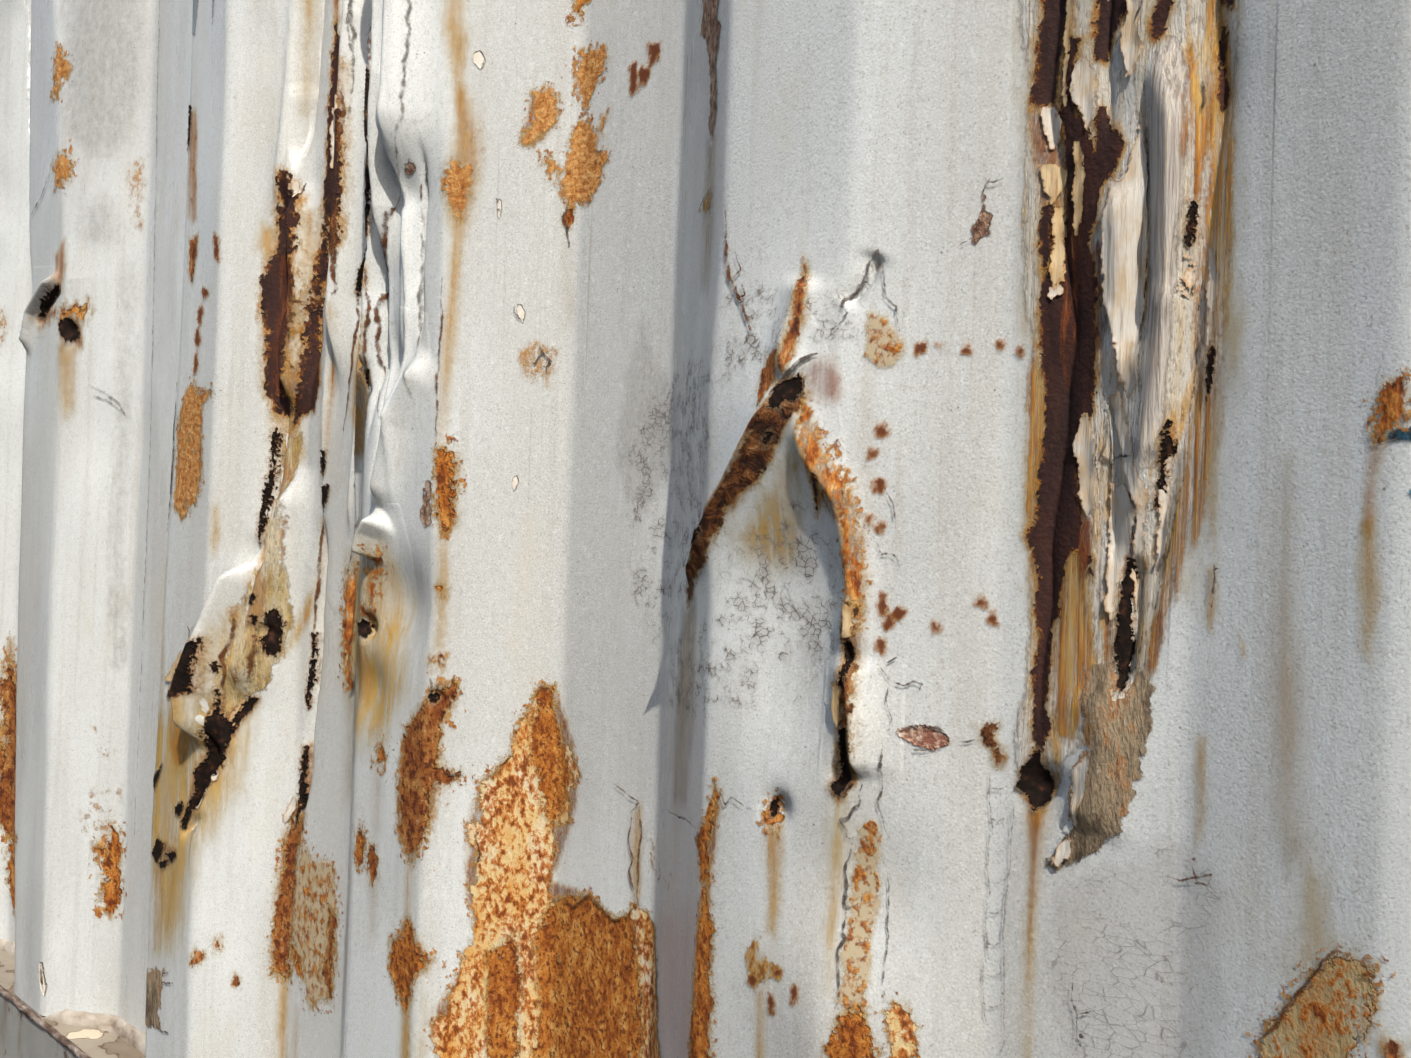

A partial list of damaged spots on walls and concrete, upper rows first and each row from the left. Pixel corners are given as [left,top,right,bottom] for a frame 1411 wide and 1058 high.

corrosion [517,0,612,247]
corrosion [167,232,219,531]
corrosion [419,433,469,540]
corrosion [756,257,809,406]
corrosion [793,373,907,655]
peeling [1014,0,1239,873]
corrosion [0,631,17,915]
corrosion [262,800,379,1022]
corrosion [337,491,660,1058]
corrosion [687,776,723,1058]
corrosion [821,820,924,1058]
corrosion [1245,938,1404,1058]